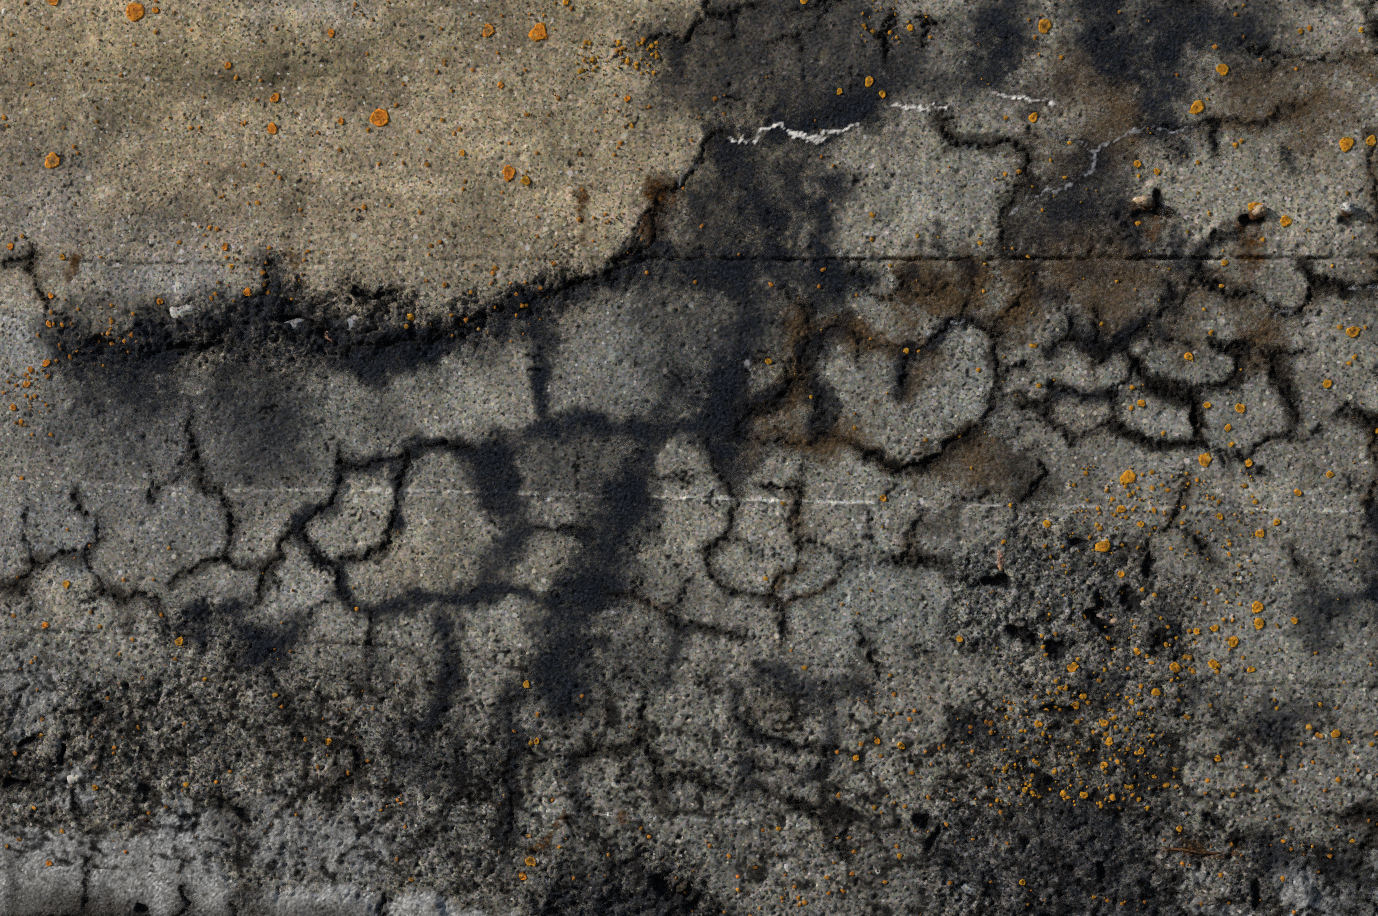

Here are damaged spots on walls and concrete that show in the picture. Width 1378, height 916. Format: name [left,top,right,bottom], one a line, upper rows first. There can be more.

crack [1139,0,1378,141]
crack [3,244,50,322]
crack [264,257,274,292]
crack [327,129,729,353]
leakage [1340,202,1355,214]
leakage [40,0,1279,736]
crack [610,105,1378,645]
leakage [1301,501,1378,653]
crack [0,411,1378,916]
leakage [756,661,863,781]
leakage [1250,704,1318,745]
leakage [1269,847,1373,916]